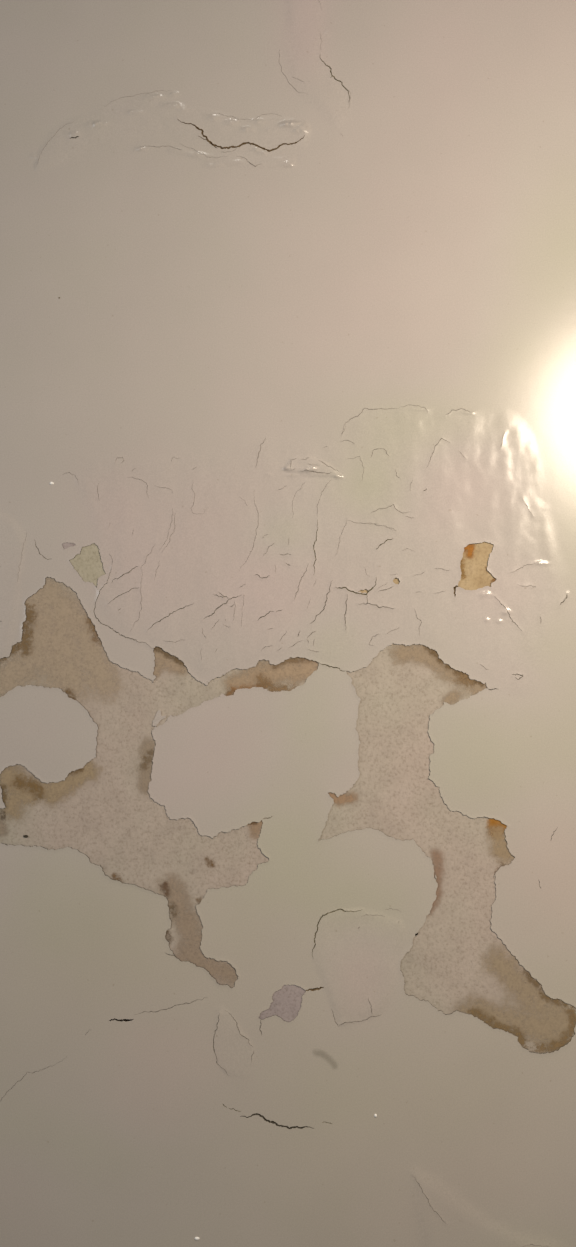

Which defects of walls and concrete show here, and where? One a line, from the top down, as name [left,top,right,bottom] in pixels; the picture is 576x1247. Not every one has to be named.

crack [321,59,350,100]
crack [179,120,305,152]
crack [94,566,283,645]
crack [312,521,394,628]
peeling [456,539,499,593]
peeling [0,540,321,991]
peeling [316,641,576,1056]
peeling [256,982,308,1024]
crack [1,998,332,1129]